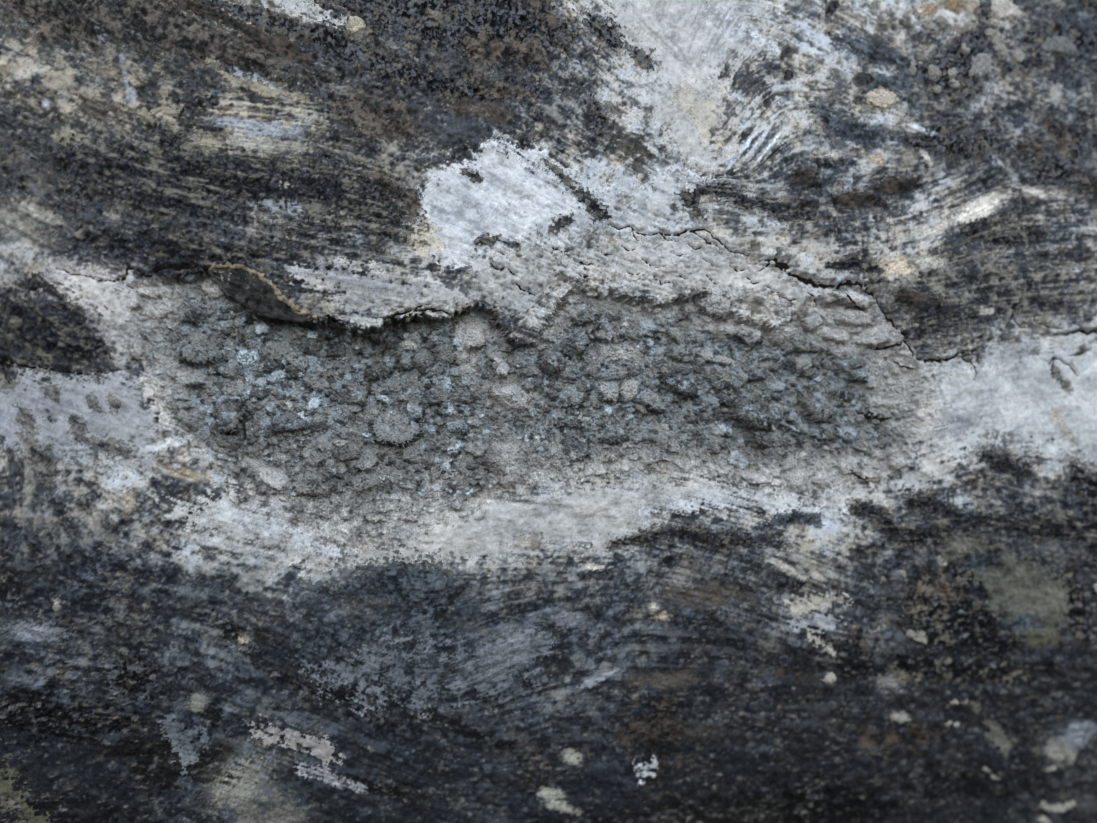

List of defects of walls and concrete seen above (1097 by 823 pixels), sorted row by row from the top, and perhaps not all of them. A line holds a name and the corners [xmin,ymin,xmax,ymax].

leakage [825,0,1097,104]
leakage [901,116,1004,165]
leakage [1031,127,1093,192]
leakage [0,0,886,492]
leakage [958,215,1054,254]
crack [552,224,977,380]
spalling [112,261,934,558]
leakage [154,324,1097,730]
leakage [156,712,214,776]
leakage [293,762,368,794]
leakage [632,755,658,786]